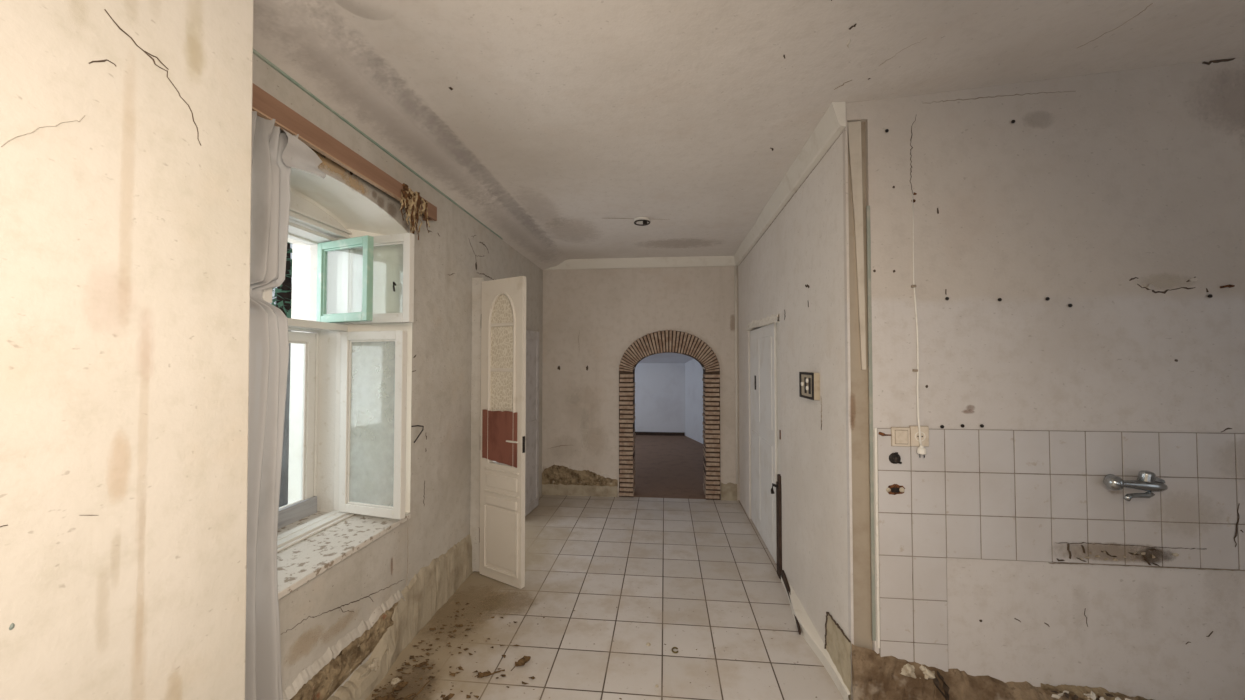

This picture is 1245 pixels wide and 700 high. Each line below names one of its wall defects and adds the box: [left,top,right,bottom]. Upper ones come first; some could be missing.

crack [89,9,201,145]
peeling [1129,277,1198,294]
spalling [542,461,618,487]
spalling [282,589,406,700]
spalling [900,663,950,700]
spalling [1041,683,1153,700]